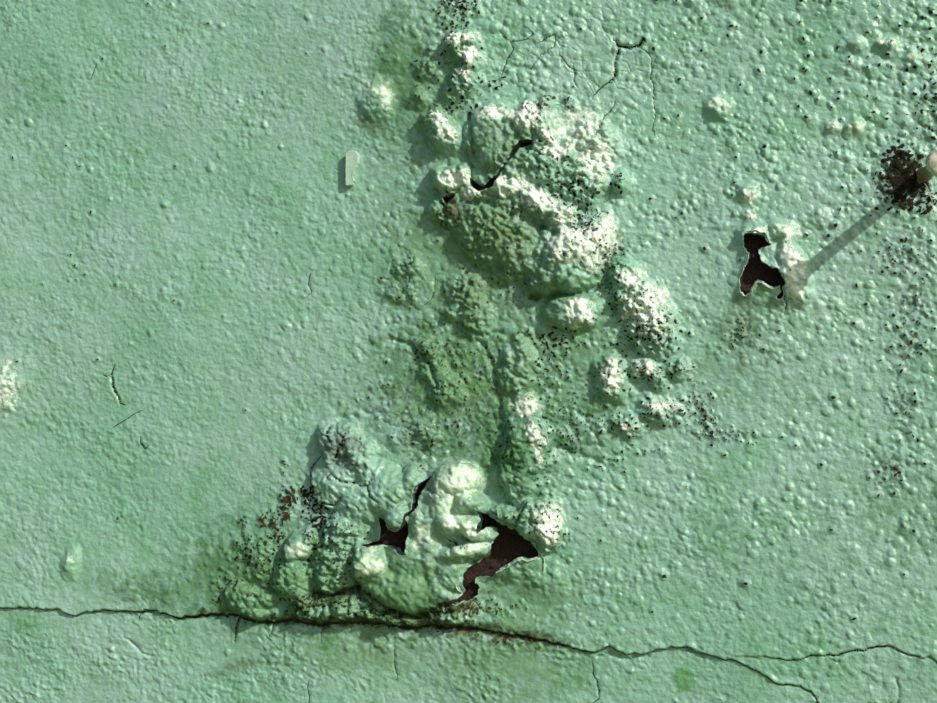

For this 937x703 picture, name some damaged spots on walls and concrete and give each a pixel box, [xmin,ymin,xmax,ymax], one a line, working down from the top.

peeling [739,230,786,299]
peeling [361,477,431,556]
peeling [443,511,545,612]
crack [2,585,937,703]